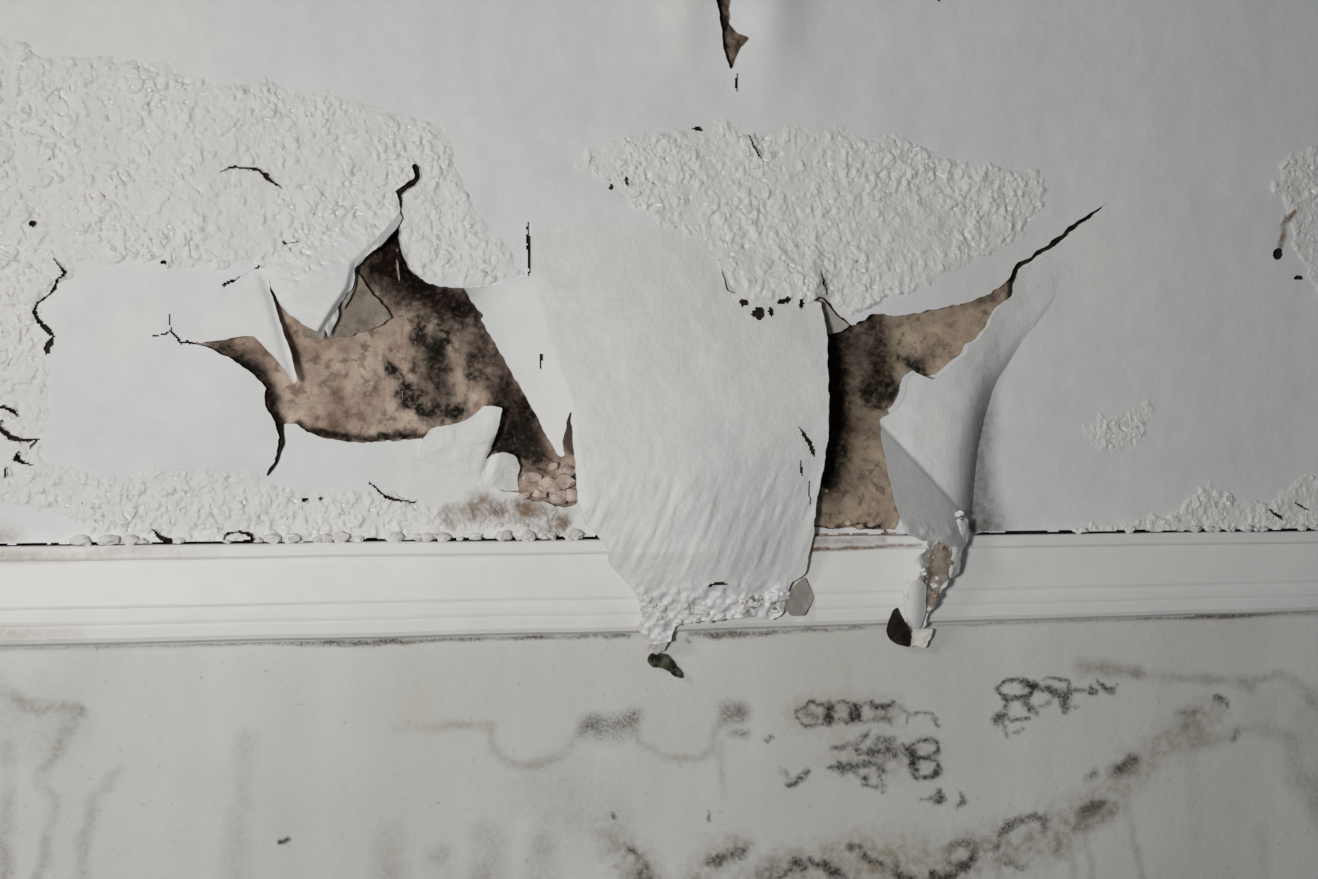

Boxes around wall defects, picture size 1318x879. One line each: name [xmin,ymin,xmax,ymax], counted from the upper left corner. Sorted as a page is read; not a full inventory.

spalling [716,0,748,68]
crack [395,164,420,209]
crack [1012,206,1103,276]
crack [32,262,67,354]
peeling [0,36,1049,655]
crack [0,405,38,476]
damp [993,678,1112,722]
damp [796,700,944,804]
damp [756,841,976,879]